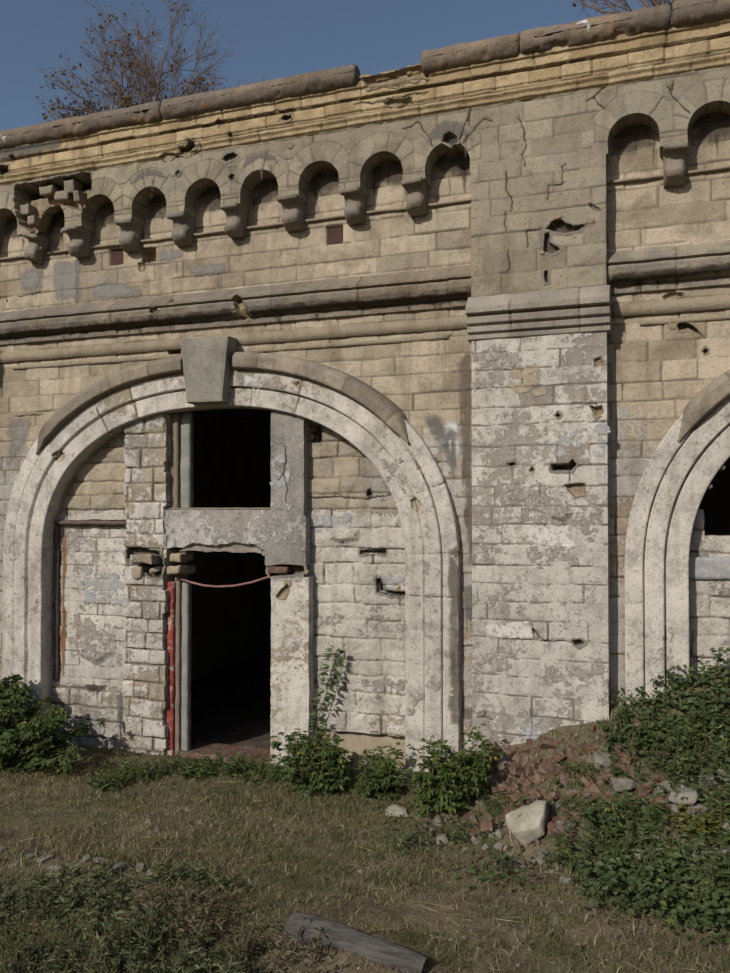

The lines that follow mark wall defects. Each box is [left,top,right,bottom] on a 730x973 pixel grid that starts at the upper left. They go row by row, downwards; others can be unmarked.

spalling [11,170,93,234]
crack [459,109,492,144]
crack [501,116,541,273]
spalling [540,203,602,286]
water stain [427,353,472,724]
peeling [500,405,610,568]